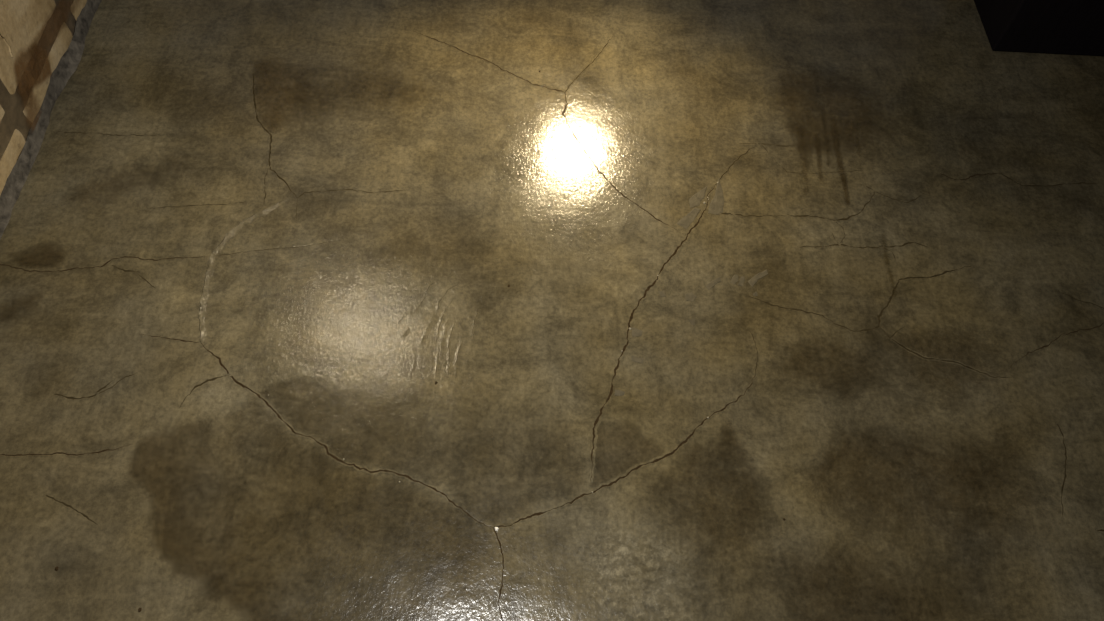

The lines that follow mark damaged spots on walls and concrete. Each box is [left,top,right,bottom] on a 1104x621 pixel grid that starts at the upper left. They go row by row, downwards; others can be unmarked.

crack [720,186,930,260]
crack [0,30,759,621]
crack [739,265,972,339]
damp [263,379,442,469]
damp [582,528,690,621]